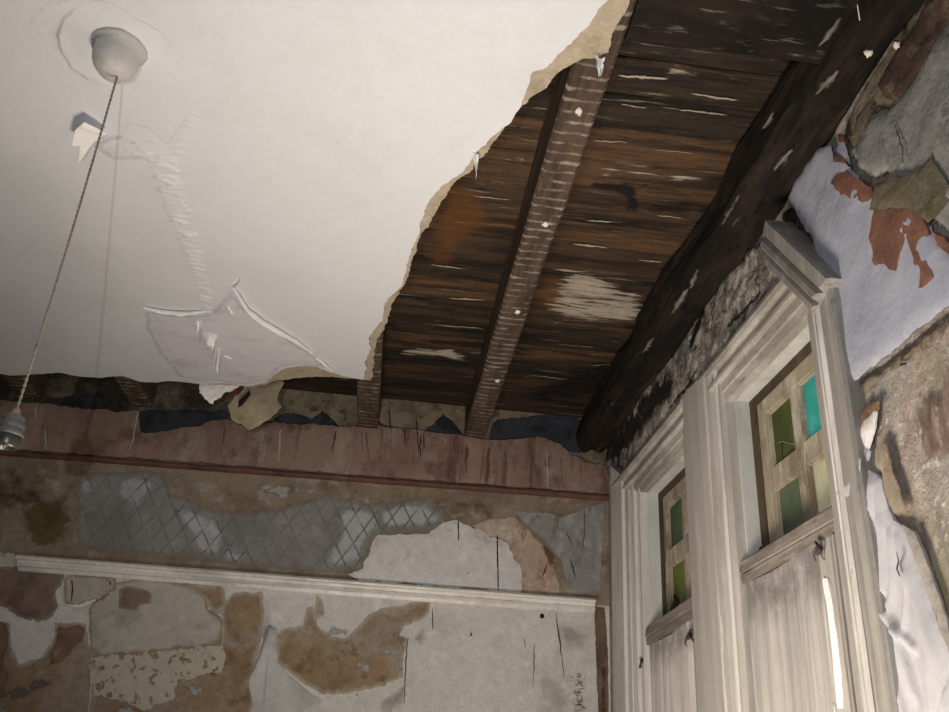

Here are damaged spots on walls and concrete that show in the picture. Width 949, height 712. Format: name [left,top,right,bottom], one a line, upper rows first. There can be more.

spalling [522,0,630,105]
peeling [72,122,139,161]
peeling [782,0,949,393]
peeling [73,128,504,387]
spalling [603,243,779,472]
peeling [425,415,462,435]
peeling [489,414,581,454]
peeling [348,517,561,595]
peeling [0,566,265,712]
peeling [276,596,430,695]
water stain [569,606,609,712]